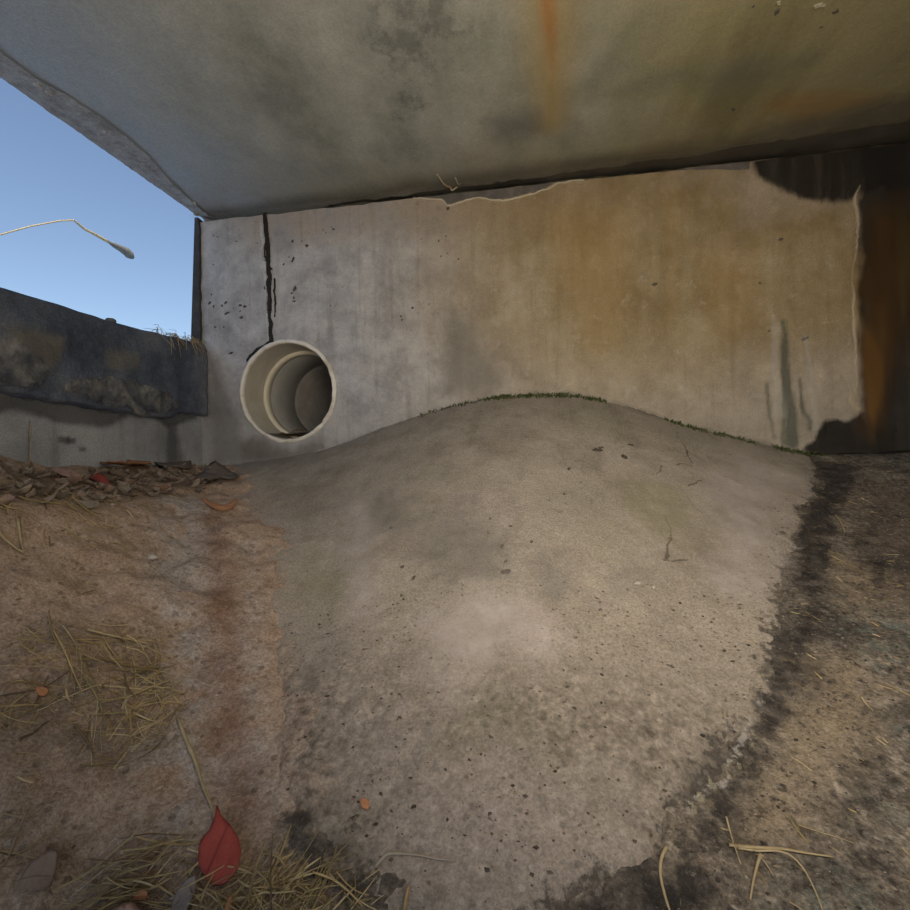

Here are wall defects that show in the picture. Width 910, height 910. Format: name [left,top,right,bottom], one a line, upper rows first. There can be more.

crack [246,213,277,362]
water stain [326,120,910,732]
water stain [279,808,367,910]
water stain [642,742,780,910]